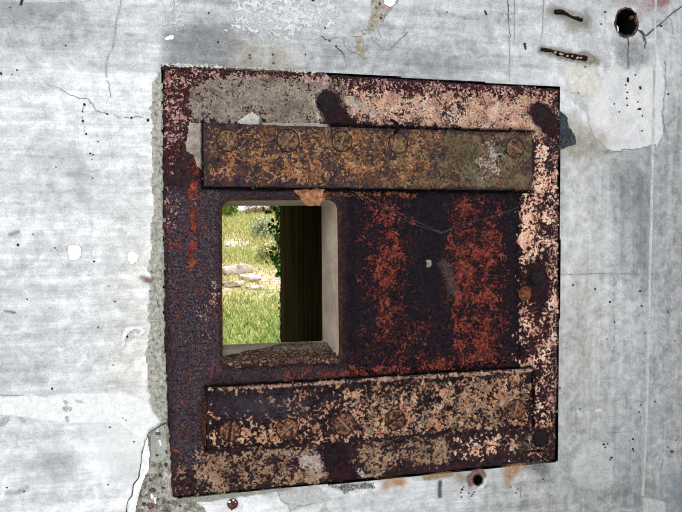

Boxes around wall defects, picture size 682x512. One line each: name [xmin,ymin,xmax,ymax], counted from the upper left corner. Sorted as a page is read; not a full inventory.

crack [49,0,149,135]
corrosion [318,90,354,125]
spalling [355,0,396,60]
corrosion [530,102,576,150]
corrosion [539,47,599,64]
peeling [563,23,669,152]
peeling [0,62,561,512]
corrosion [164,131,536,470]
corrosion [526,260,549,312]
crack [126,423,166,512]
corrosion [321,445,355,481]
corrosion [423,472,452,498]